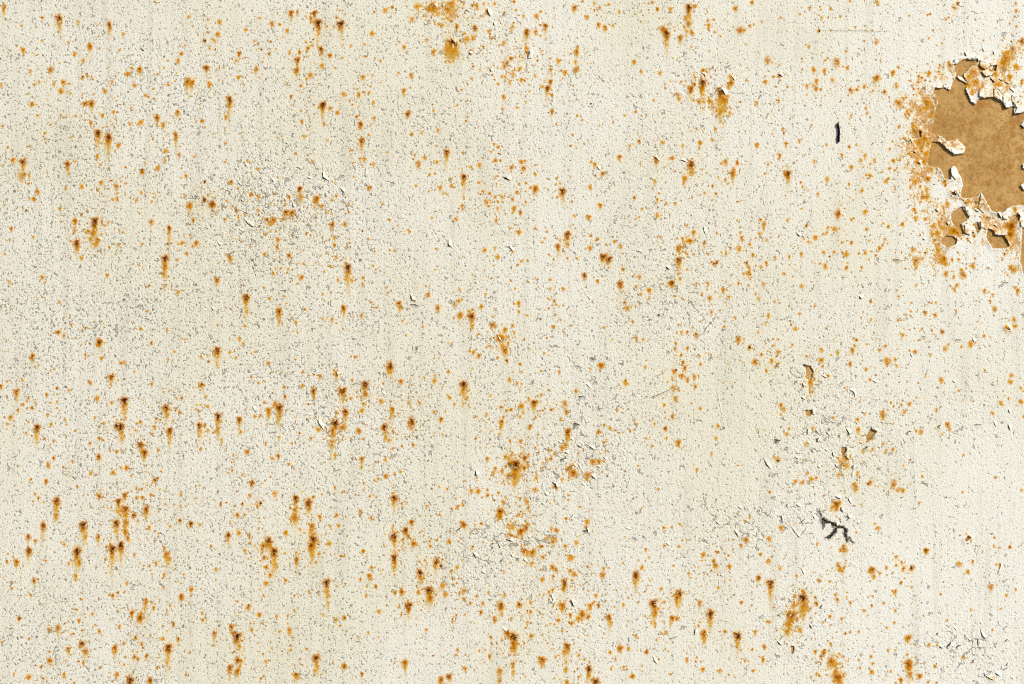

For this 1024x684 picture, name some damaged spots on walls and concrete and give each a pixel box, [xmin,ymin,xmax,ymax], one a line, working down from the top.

corrosion [390,0,620,127]
corrosion [2,141,52,212]
corrosion [28,1,387,343]
peeling [917,56,1024,274]
peeling [790,365,814,380]
crack [716,359,912,543]
corrosion [920,519,1022,611]